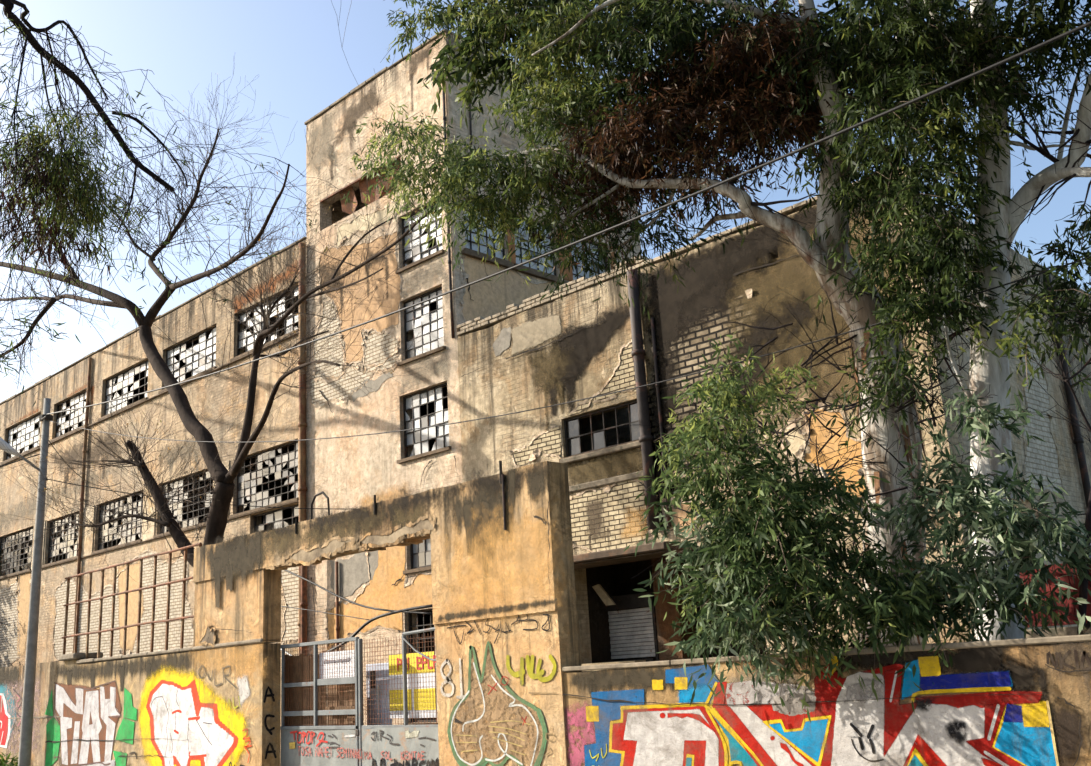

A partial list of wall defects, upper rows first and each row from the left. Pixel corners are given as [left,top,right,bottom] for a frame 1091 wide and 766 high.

peeling [309,198,407,409]
water stain [511,305,630,431]
peeling [510,289,757,481]
water stain [568,226,857,528]
water stain [848,189,900,303]
peeling [281,514,436,651]
water stain [202,459,549,608]
spalling [439,598,557,621]
peeling [570,479,654,552]
peeling [660,496,698,538]